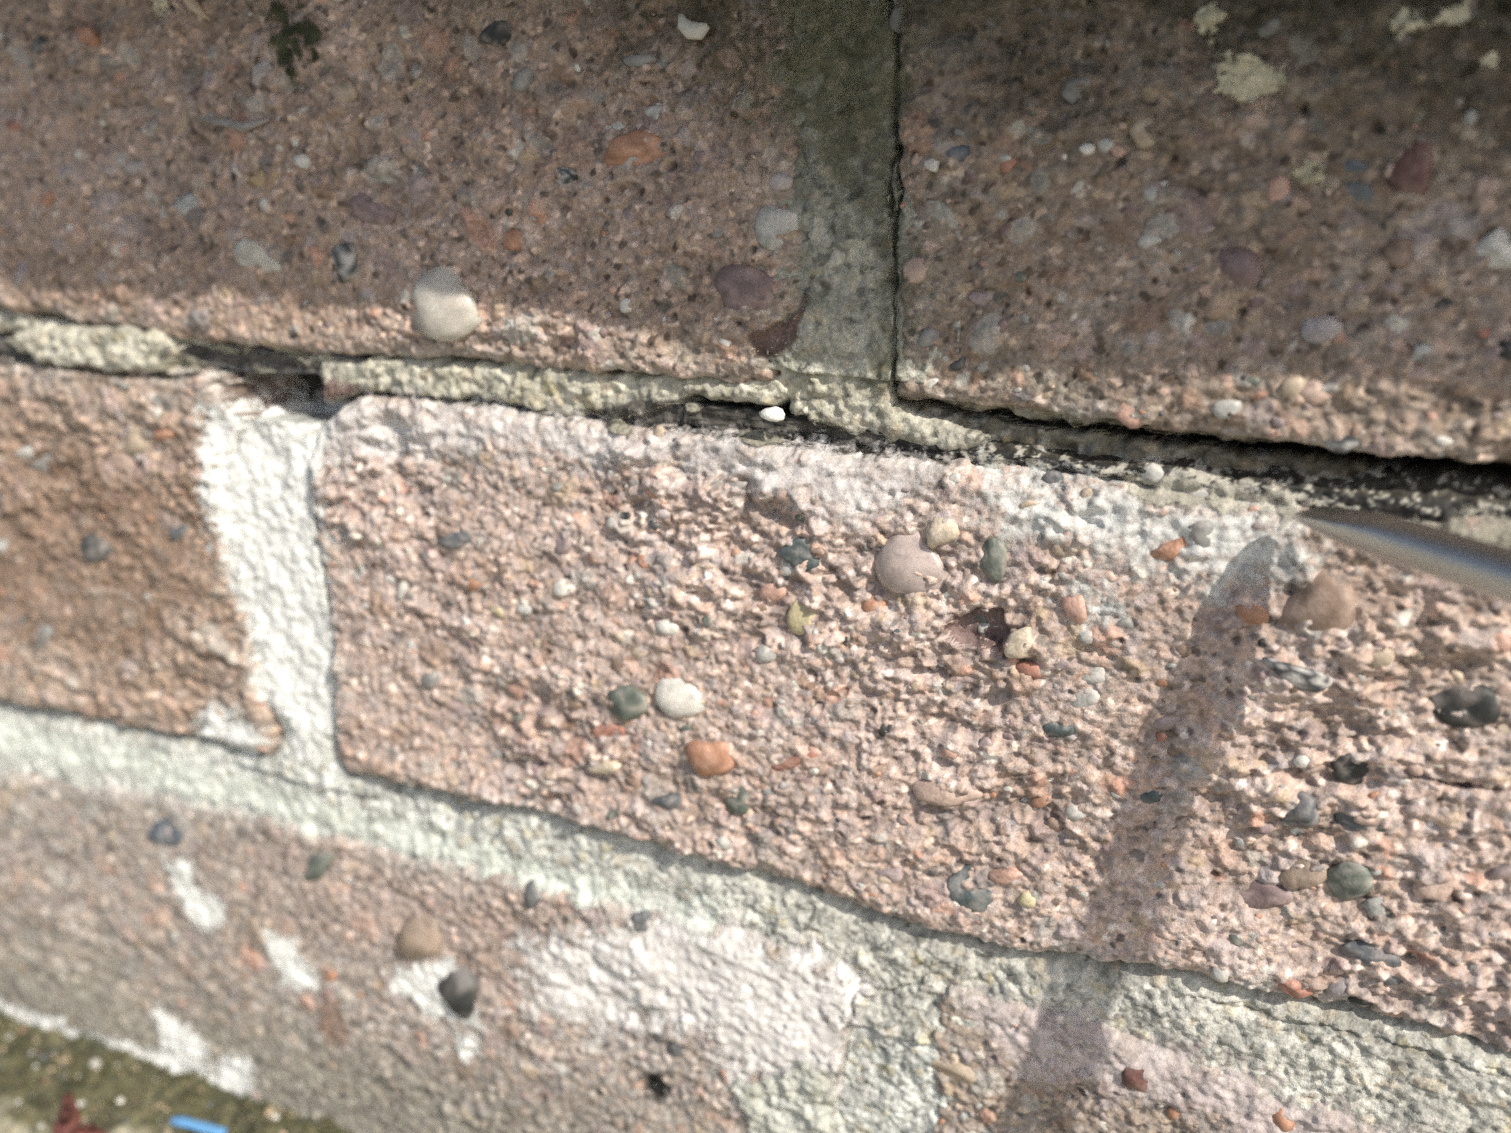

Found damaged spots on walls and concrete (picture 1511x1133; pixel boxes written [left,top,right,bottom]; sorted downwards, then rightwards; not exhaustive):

crack [885,40,904,319]
crack [326,392,581,423]
crack [626,422,949,466]
crack [891,356,1511,480]